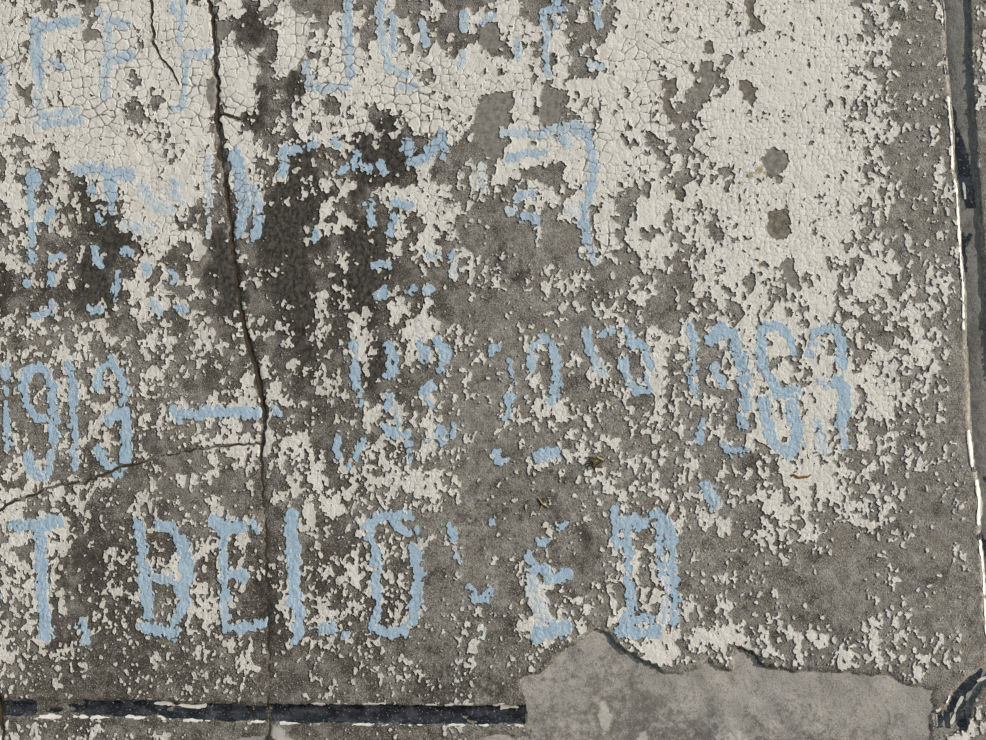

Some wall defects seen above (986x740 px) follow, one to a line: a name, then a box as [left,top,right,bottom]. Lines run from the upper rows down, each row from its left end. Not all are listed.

peeling [420,0,448,22]
peeling [972,5,986,119]
peeling [915,146,959,241]
peeling [225,226,287,290]
crack [0,0,272,740]
peeling [459,367,491,404]
peeling [517,322,567,365]
spalling [441,493,972,740]
peeling [114,616,179,700]
peeling [166,667,208,701]
peeling [0,717,134,740]
peeling [940,698,986,740]